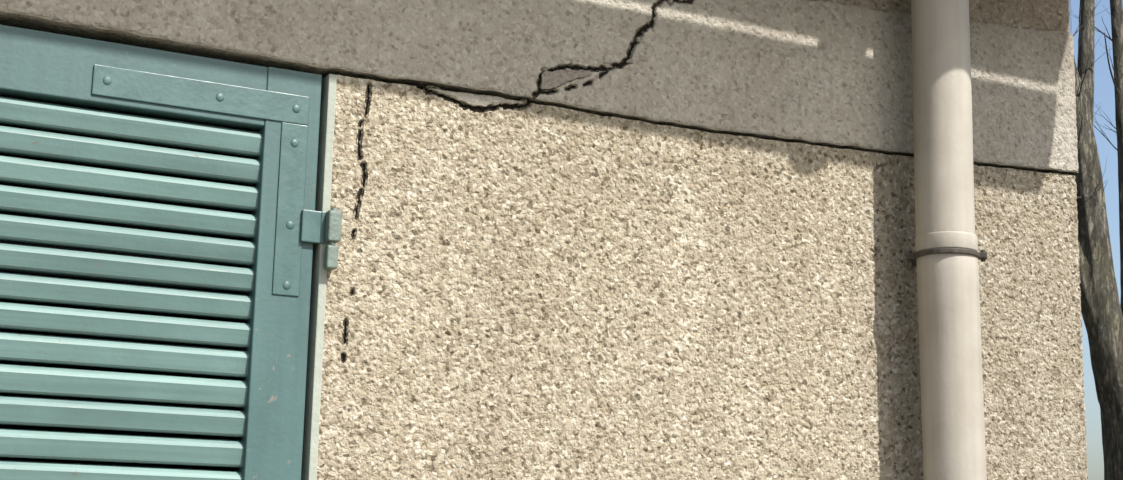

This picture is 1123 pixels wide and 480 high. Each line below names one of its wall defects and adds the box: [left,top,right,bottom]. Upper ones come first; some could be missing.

crack [406,0,693,111]
spalling [540,69,591,90]
crack [351,84,370,240]
crack [340,321,348,361]